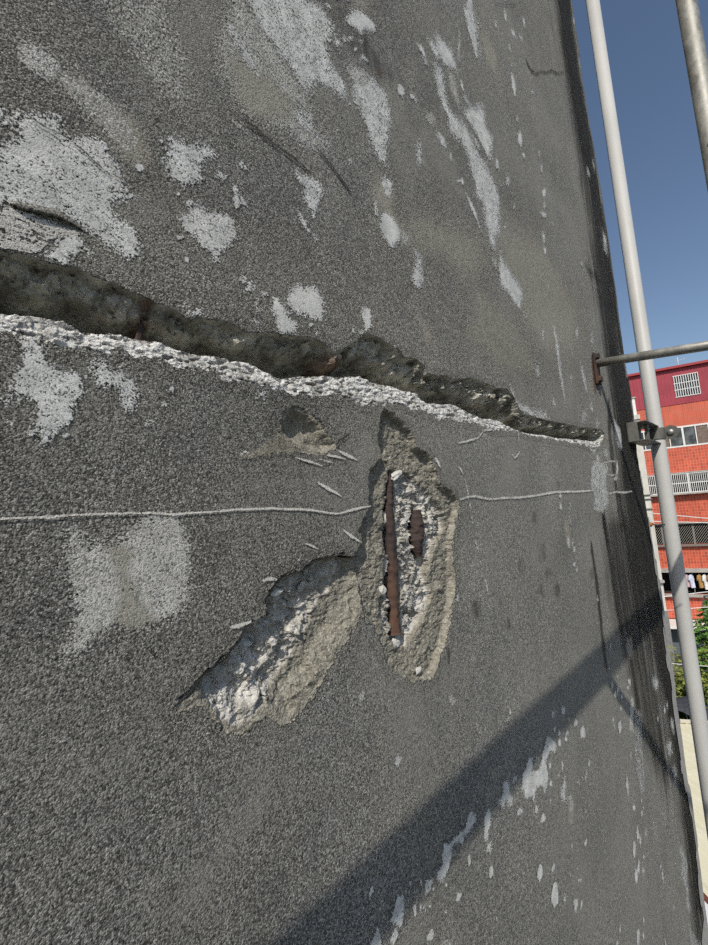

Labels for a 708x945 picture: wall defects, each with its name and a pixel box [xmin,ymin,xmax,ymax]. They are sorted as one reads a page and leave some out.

water stain [57,71,152,166]
water stain [105,0,192,110]
water stain [213,22,331,159]
water stain [346,0,389,77]
crack [0,235,605,453]
water stain [398,204,583,375]
spalling [157,406,464,752]